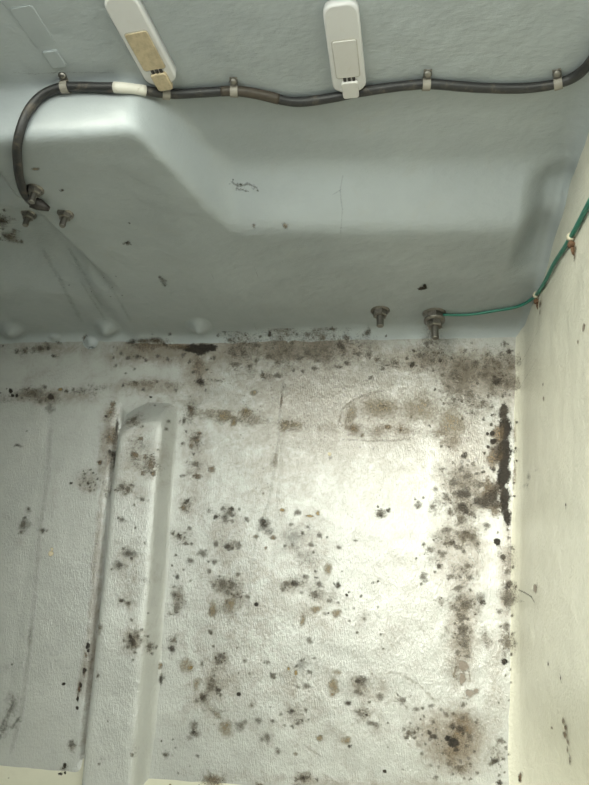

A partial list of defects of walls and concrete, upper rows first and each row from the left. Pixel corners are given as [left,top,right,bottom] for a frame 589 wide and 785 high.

damp [0,384,98,402]
damp [70,402,144,492]
damp [113,327,521,683]
damp [194,675,221,702]
damp [345,672,389,727]
damp [397,694,479,780]